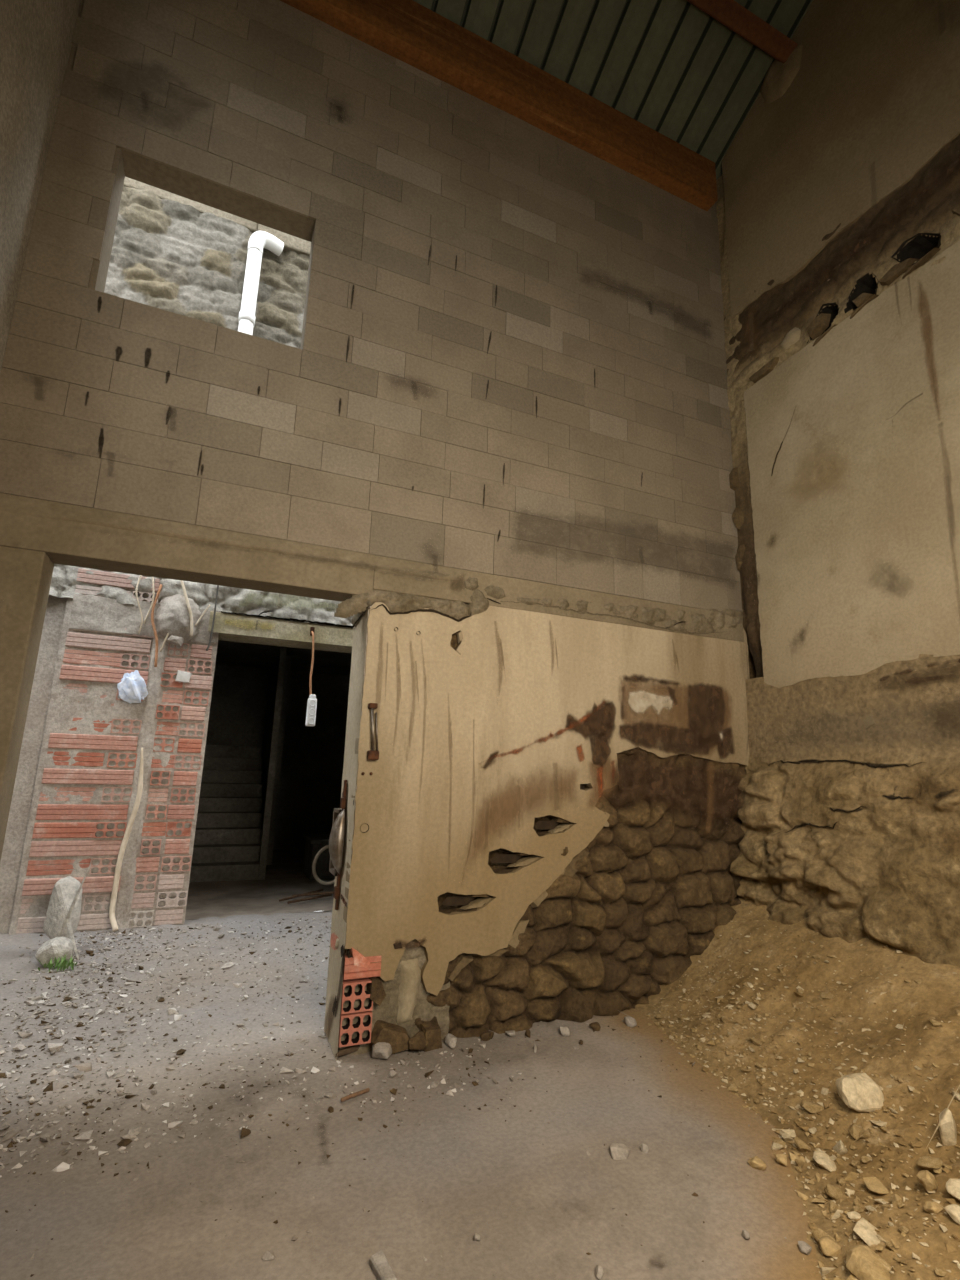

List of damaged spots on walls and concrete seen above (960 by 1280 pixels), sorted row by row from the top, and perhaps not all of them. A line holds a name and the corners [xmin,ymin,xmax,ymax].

flaking render [716,134,960,678]
flaking render [306,748,747,1065]
spalling [933,789,960,812]